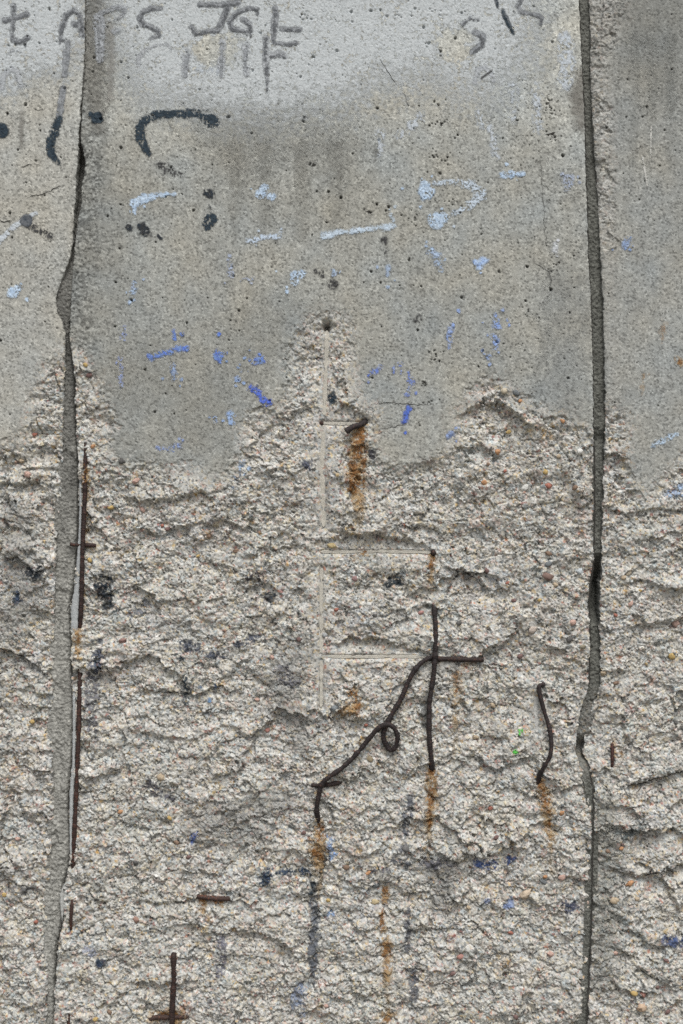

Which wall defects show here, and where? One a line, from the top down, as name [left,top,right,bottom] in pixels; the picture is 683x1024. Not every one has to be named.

crack [579,0,596,684]
crack [67,376,79,635]
rust [345,421,367,536]
spalling [0,309,683,1024]
rust [339,690,364,716]
rust [309,821,325,899]
rust [423,769,439,855]
rust [537,778,556,861]
crack [586,773,595,1024]
crack [54,915,64,1012]